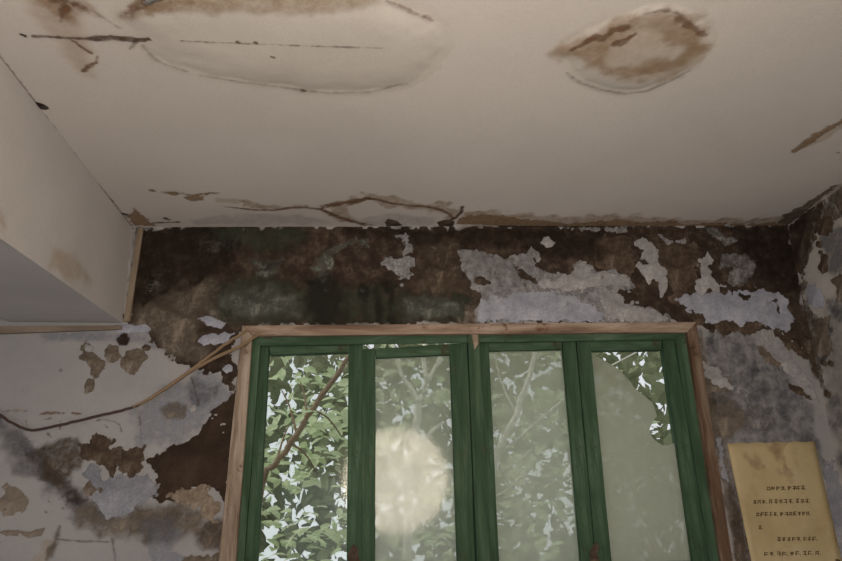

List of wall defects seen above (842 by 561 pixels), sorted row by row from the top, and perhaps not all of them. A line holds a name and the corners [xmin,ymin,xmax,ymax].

peeling [792,119,842,153]
water stain [218,274,469,325]
flaking render [37,185,842,561]
peeling [0,483,29,517]
water stain [0,417,178,542]
peeling [0,528,45,538]